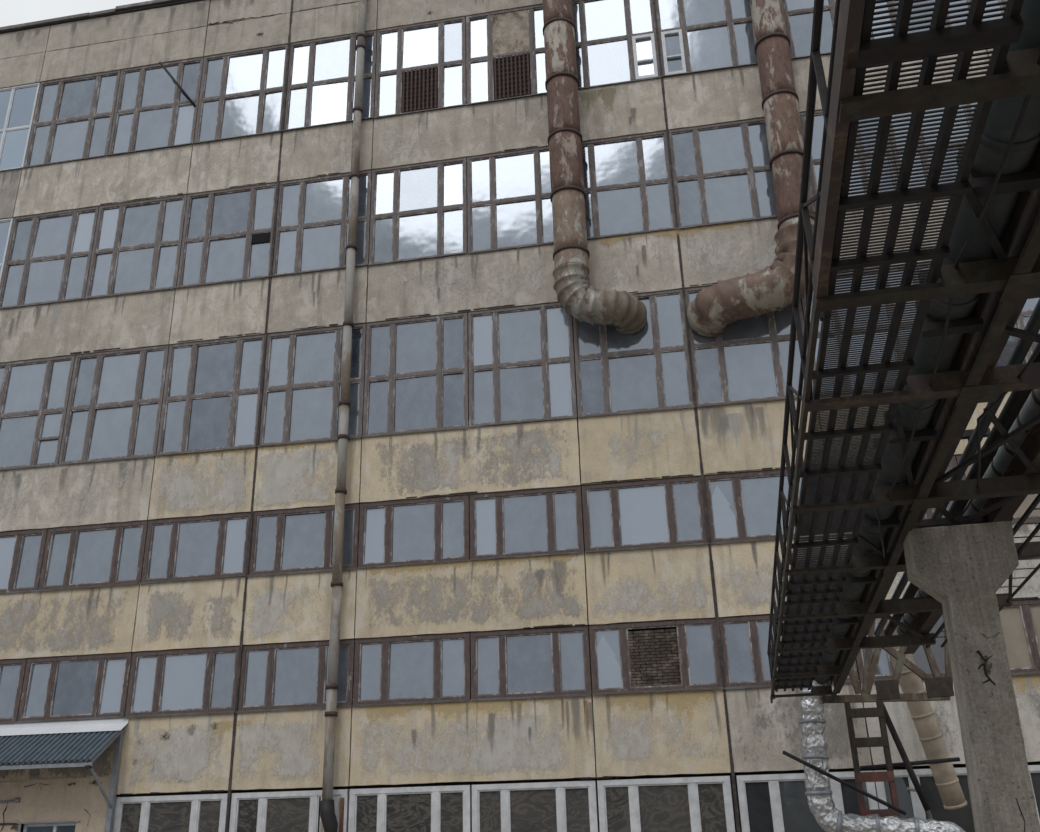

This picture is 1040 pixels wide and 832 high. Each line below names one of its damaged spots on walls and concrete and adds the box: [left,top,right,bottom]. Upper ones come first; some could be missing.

peeling [376,442,477,499]
peeling [452,429,566,487]
peeling [0,591,128,653]
peeling [370,569,585,629]
crack [976,632,1000,685]
water stain [366,698,551,735]
peeling [361,713,566,775]
water stain [605,690,712,716]